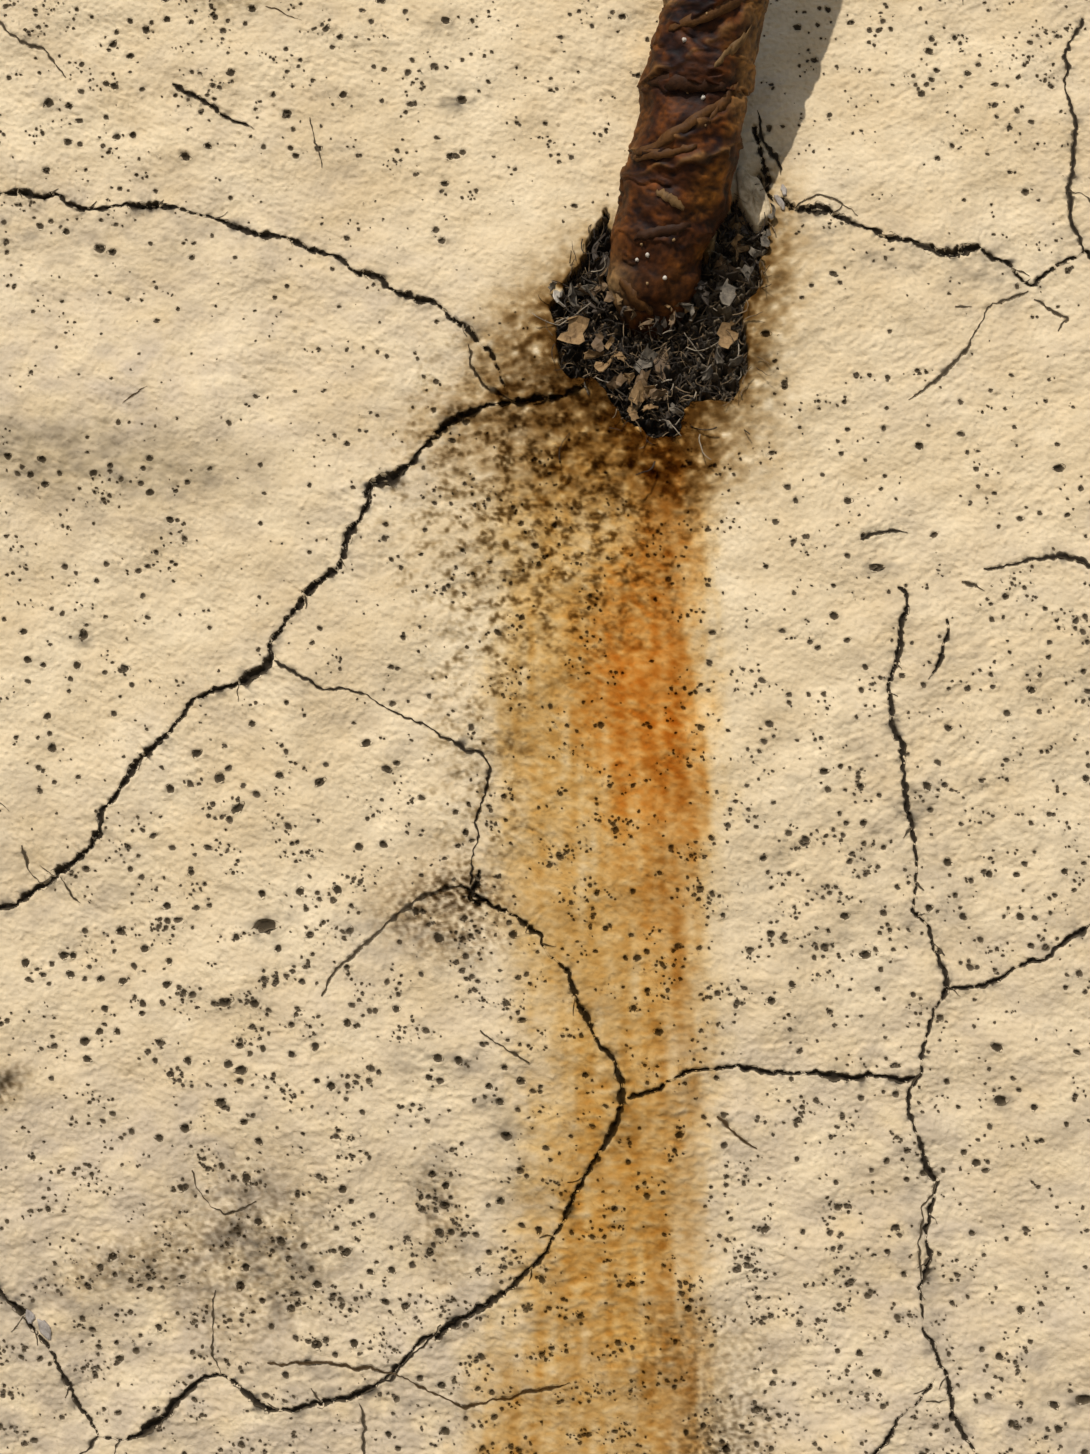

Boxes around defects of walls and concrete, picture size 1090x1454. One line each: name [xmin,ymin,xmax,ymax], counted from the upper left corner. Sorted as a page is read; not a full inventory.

crack [0,21,66,78]
crack [172,83,254,129]
crack [0,188,504,392]
crack [309,117,322,167]
crack [541,386,584,402]
spalling [532,166,776,475]
crack [751,18,1090,400]
crack [0,394,1090,1454]